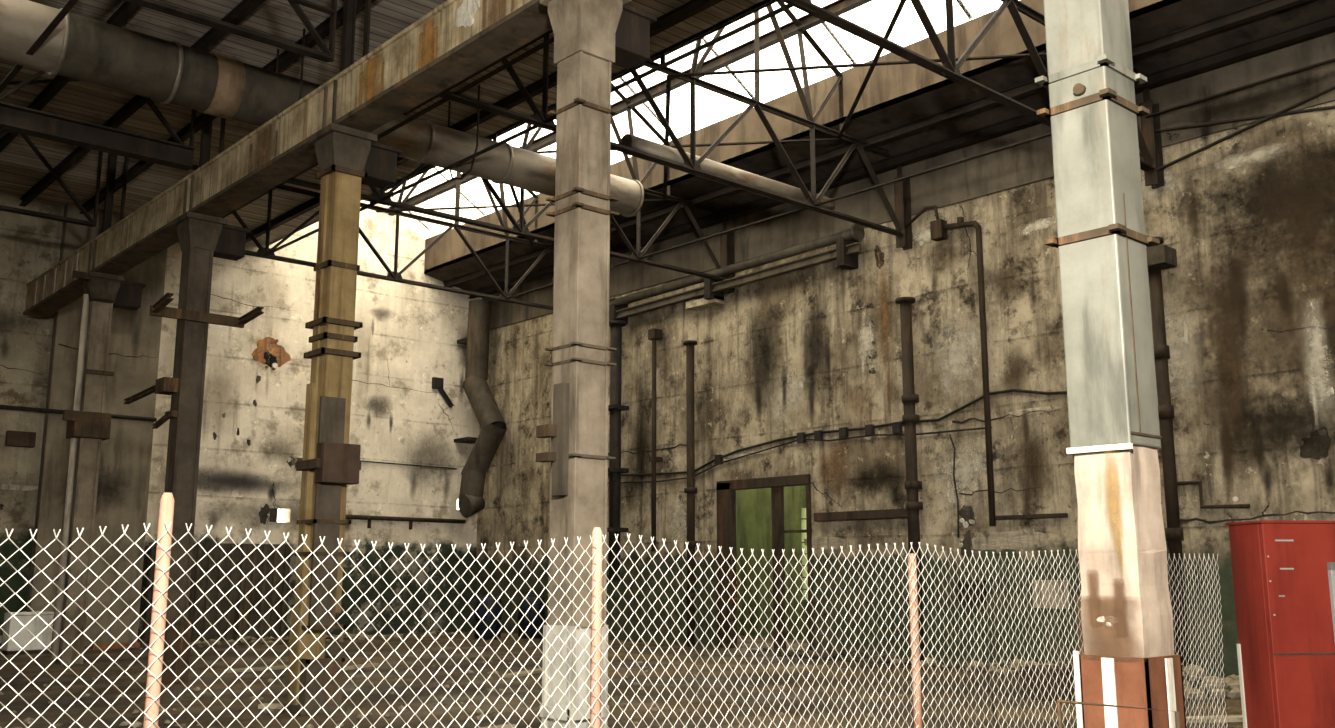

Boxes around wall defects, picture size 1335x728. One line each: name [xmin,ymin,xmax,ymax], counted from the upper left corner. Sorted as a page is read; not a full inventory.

rust [358,55,384,106]
rust [418,18,438,69]
rust [482,0,515,28]
damp [1192,143,1335,492]
damp [753,328,786,413]
damp [806,306,830,416]